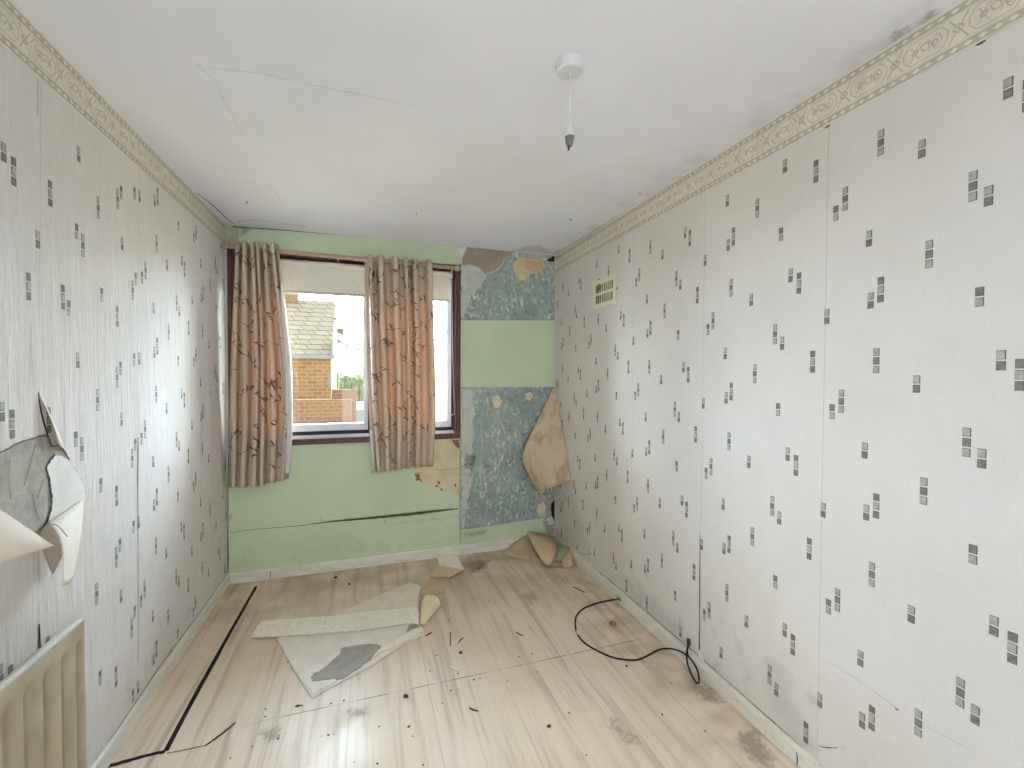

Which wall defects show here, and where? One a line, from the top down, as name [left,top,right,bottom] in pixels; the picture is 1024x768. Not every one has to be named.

crack [198,178,354,237]
peeling [458,247,555,281]
peeling [0,434,87,565]
flaking render [535,494,555,525]
crack [110,451,473,740]